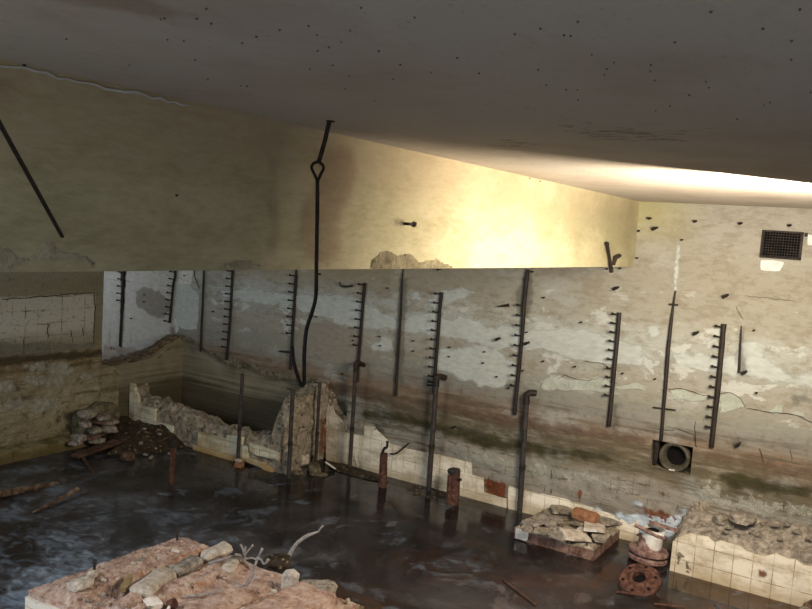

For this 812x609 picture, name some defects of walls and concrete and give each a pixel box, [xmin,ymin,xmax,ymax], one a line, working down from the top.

crack [0,65,189,106]
flaking render [370,251,452,269]
peeling [102,271,199,360]
peeling [221,288,643,388]
peeling [673,341,812,388]
flaking render [327,389,347,432]
peeling [541,375,647,392]
peeling [671,389,708,401]
peeling [720,393,745,413]
crack [670,388,811,422]
corrosion [485,479,506,498]